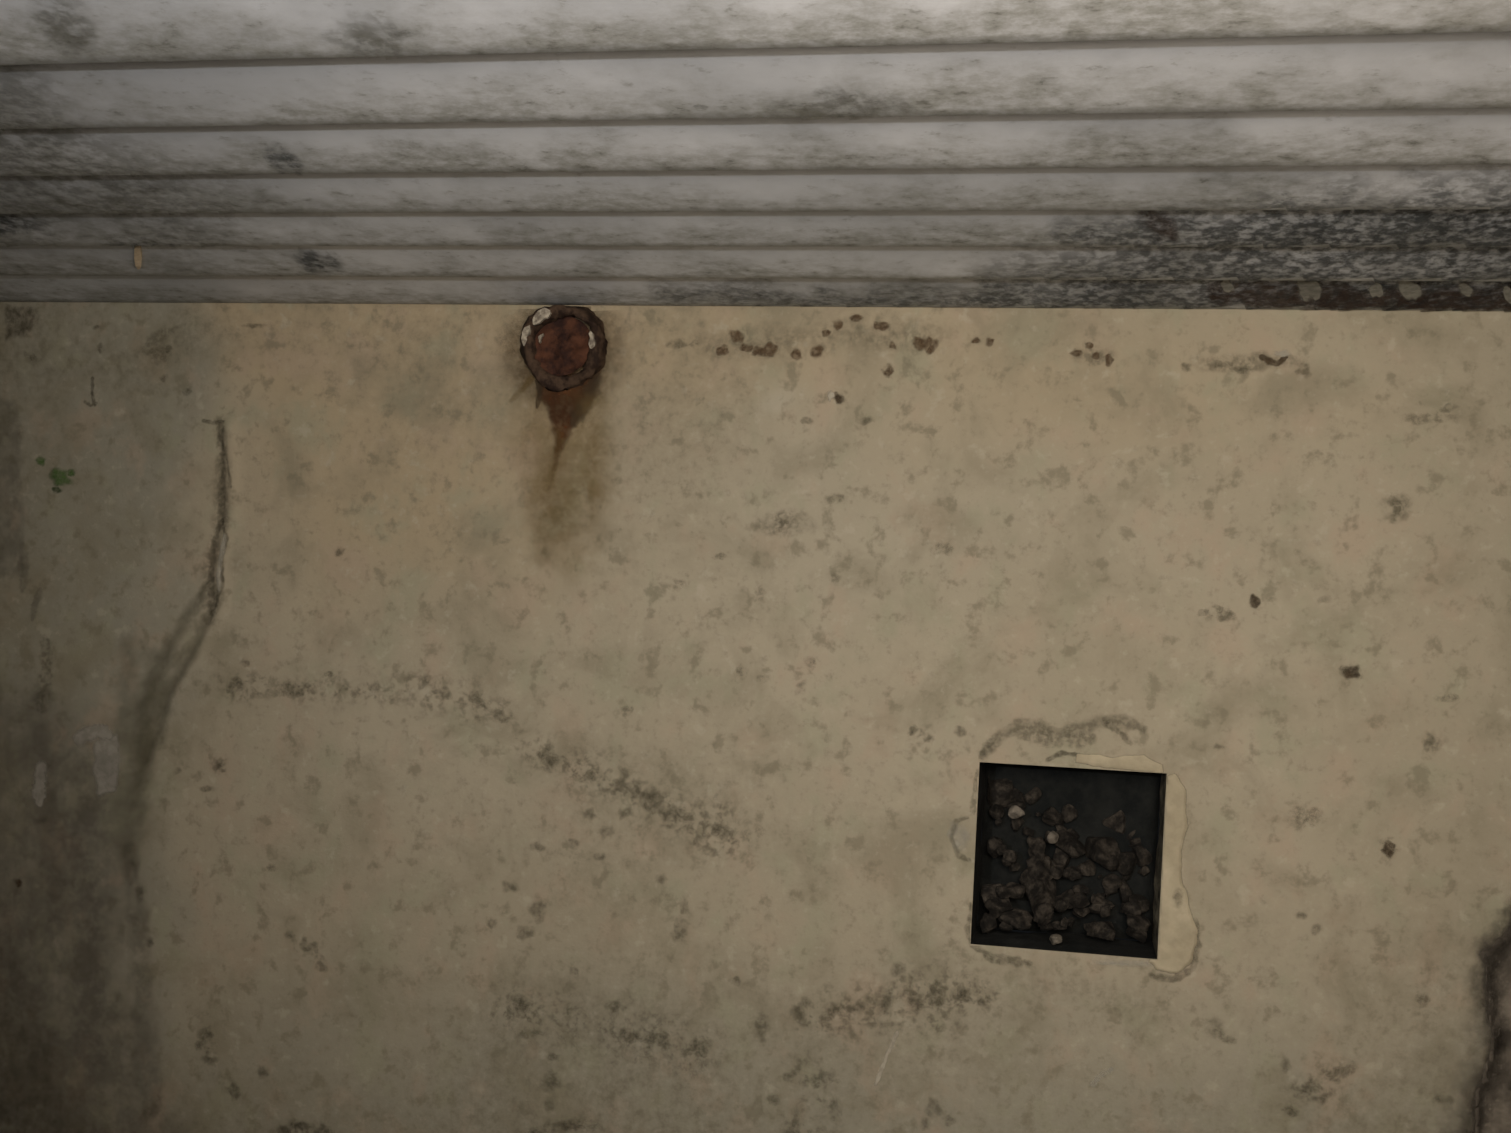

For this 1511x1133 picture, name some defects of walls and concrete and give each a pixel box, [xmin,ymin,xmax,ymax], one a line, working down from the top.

corrosion [511,316,610,458]
corrosion [717,315,895,358]
corrosion [913,337,937,354]
spalling [1472,923,1511,1133]